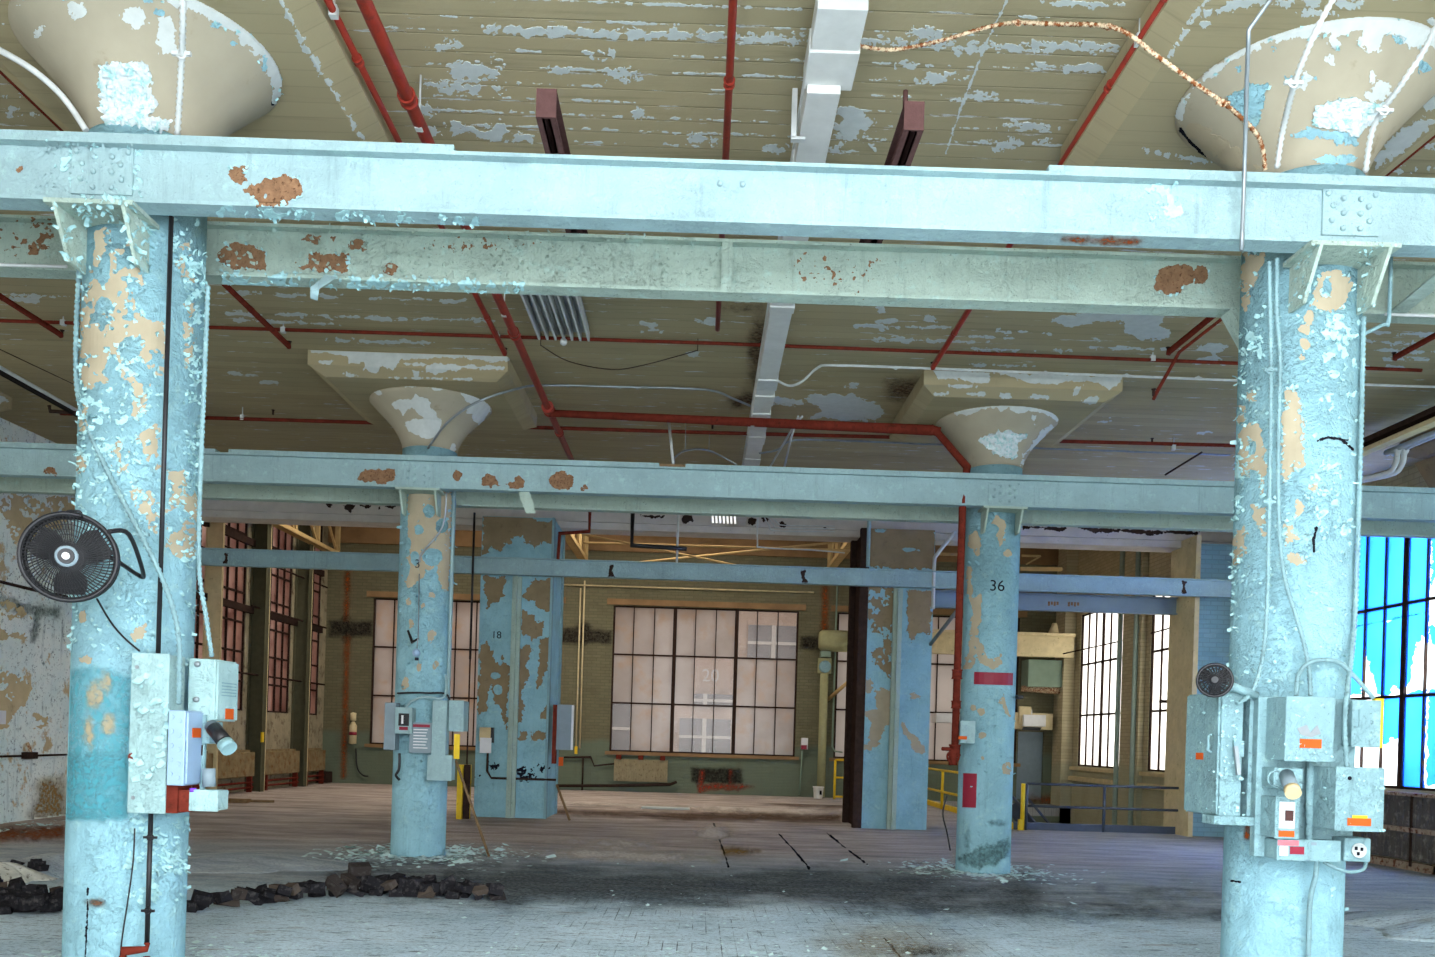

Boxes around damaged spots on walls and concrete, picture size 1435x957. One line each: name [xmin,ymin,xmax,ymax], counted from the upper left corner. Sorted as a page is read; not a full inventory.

spalling [97,0,284,134]
peeling [384,0,810,155]
peeling [828,25,1120,155]
peeling [1142,0,1435,175]
corrosion [227,165,303,211]
corrosion [216,241,267,272]
corrosion [295,234,367,274]
corrosion [1154,264,1210,297]
peeling [853,252,1266,466]
peeling [0,216,525,836]
corrosion [357,468,396,485]
corrosion [549,470,588,491]